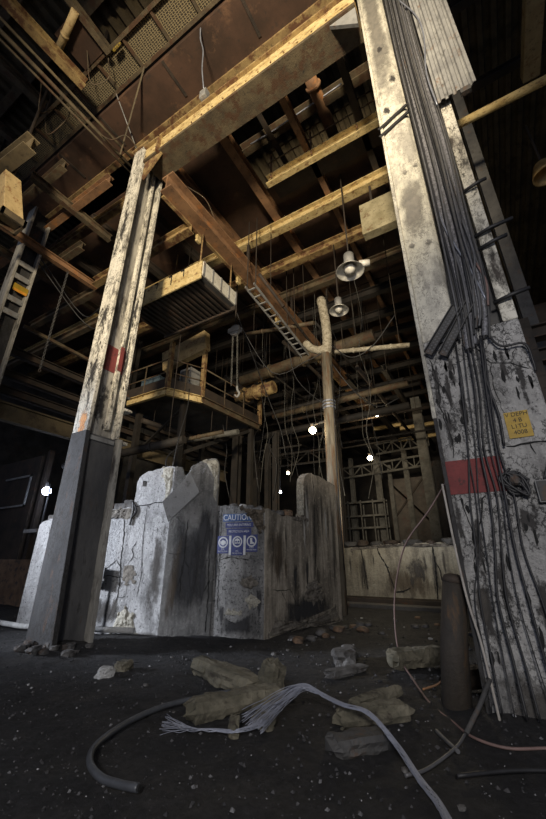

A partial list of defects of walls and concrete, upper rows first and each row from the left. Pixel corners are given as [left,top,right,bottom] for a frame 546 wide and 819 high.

crack [106,502,163,613]
water stain [190,512,218,603]
crack [361,548,411,593]
spalling [109,606,138,634]